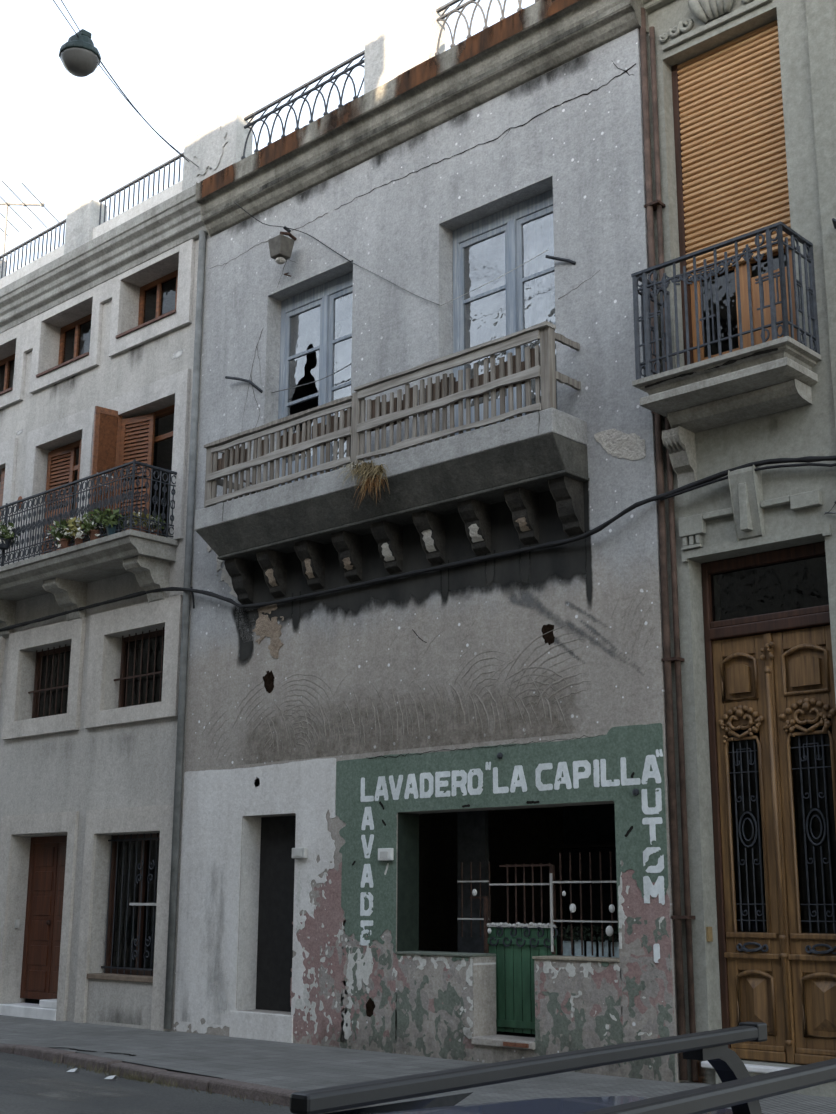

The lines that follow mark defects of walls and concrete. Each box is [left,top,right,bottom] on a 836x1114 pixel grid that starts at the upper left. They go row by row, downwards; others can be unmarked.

corrosion [456,8,525,65]
corrosion [541,0,580,20]
corrosion [395,54,439,97]
corrosion [255,95,363,170]
crack [292,60,636,231]
corrosion [200,163,235,199]
spalling [252,604,284,659]
peeling [290,858,475,1060]
peeling [534,861,675,1057]
peeling [599,1054,676,1082]